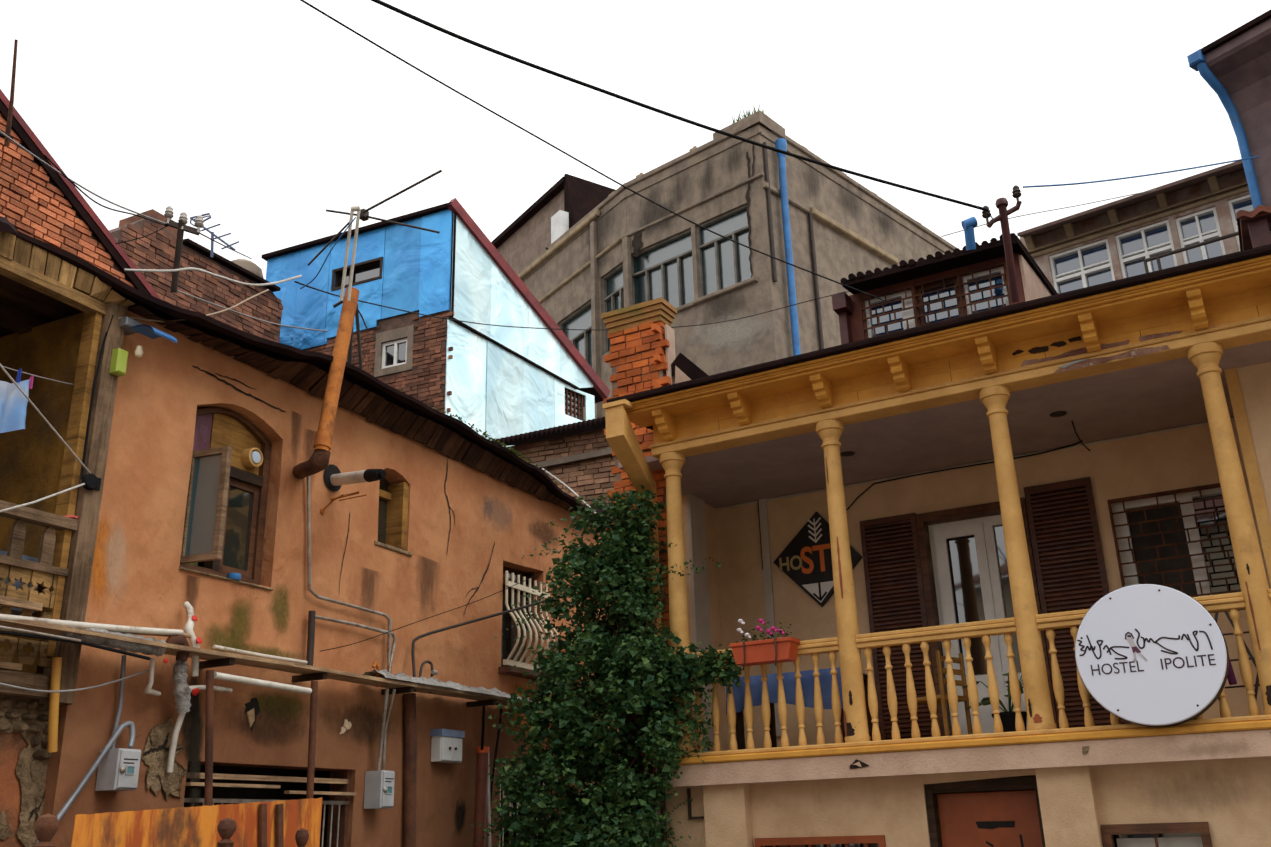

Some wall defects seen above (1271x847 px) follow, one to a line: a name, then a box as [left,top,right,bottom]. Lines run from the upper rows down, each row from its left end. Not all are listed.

crack [192,365,286,412]
peeling [1012,330,1182,374]
crack [444,457,455,552]
spalling [0,734,49,847]
spalling [141,716,188,800]